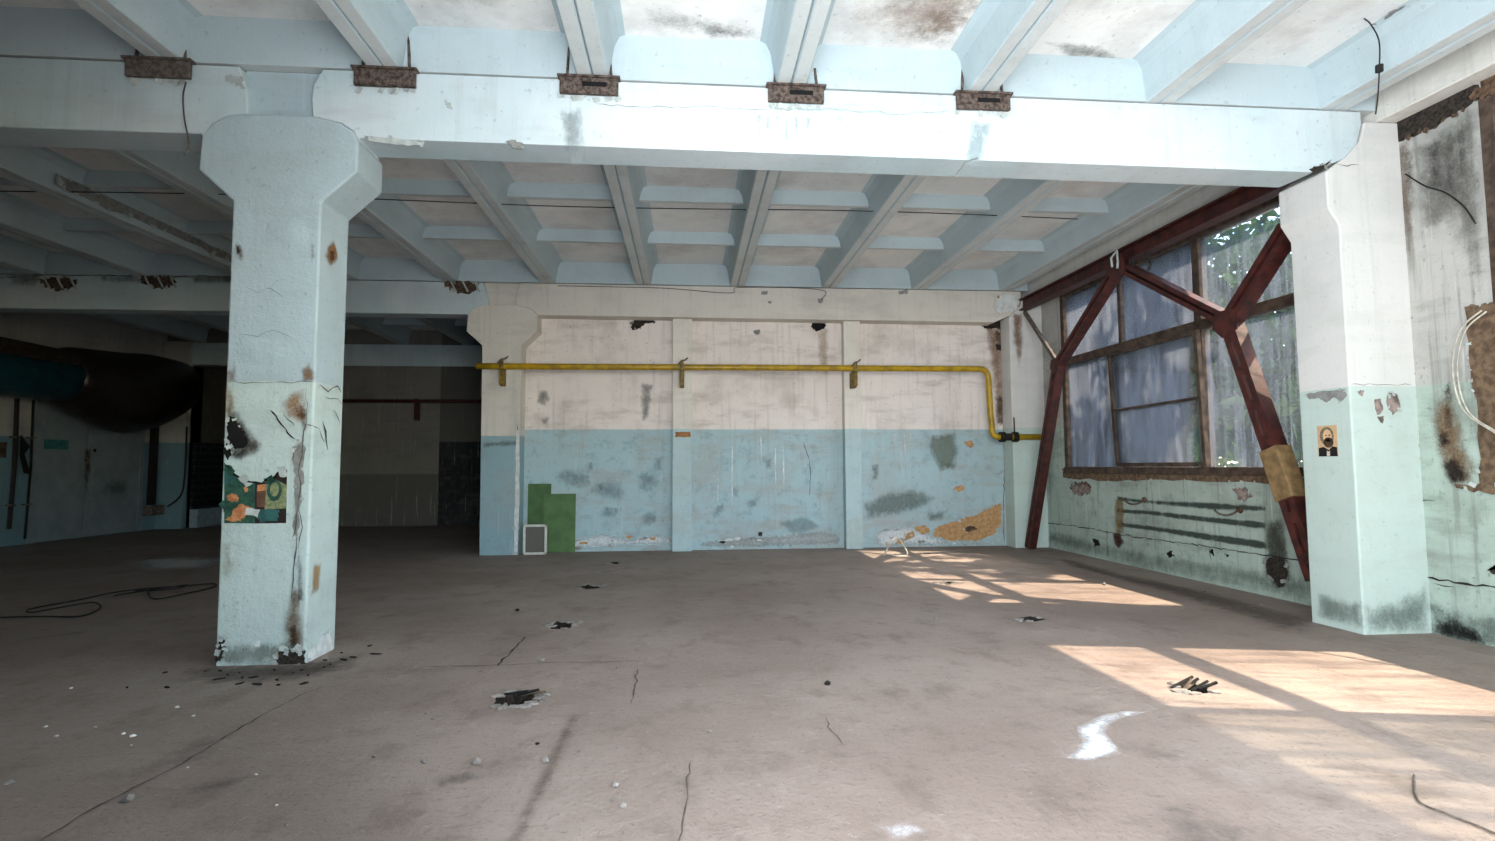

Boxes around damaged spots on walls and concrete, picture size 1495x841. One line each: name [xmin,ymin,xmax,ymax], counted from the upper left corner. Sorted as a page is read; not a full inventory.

water stain [1427,132,1472,226]
rust [327,244,337,264]
rust [288,396,305,424]
flaking render [1454,301,1495,494]
spalling [223,416,247,460]
flaking render [1061,467,1269,503]
flaking render [878,503,1004,547]
water stain [1322,599,1357,620]
water stain [1378,603,1422,625]